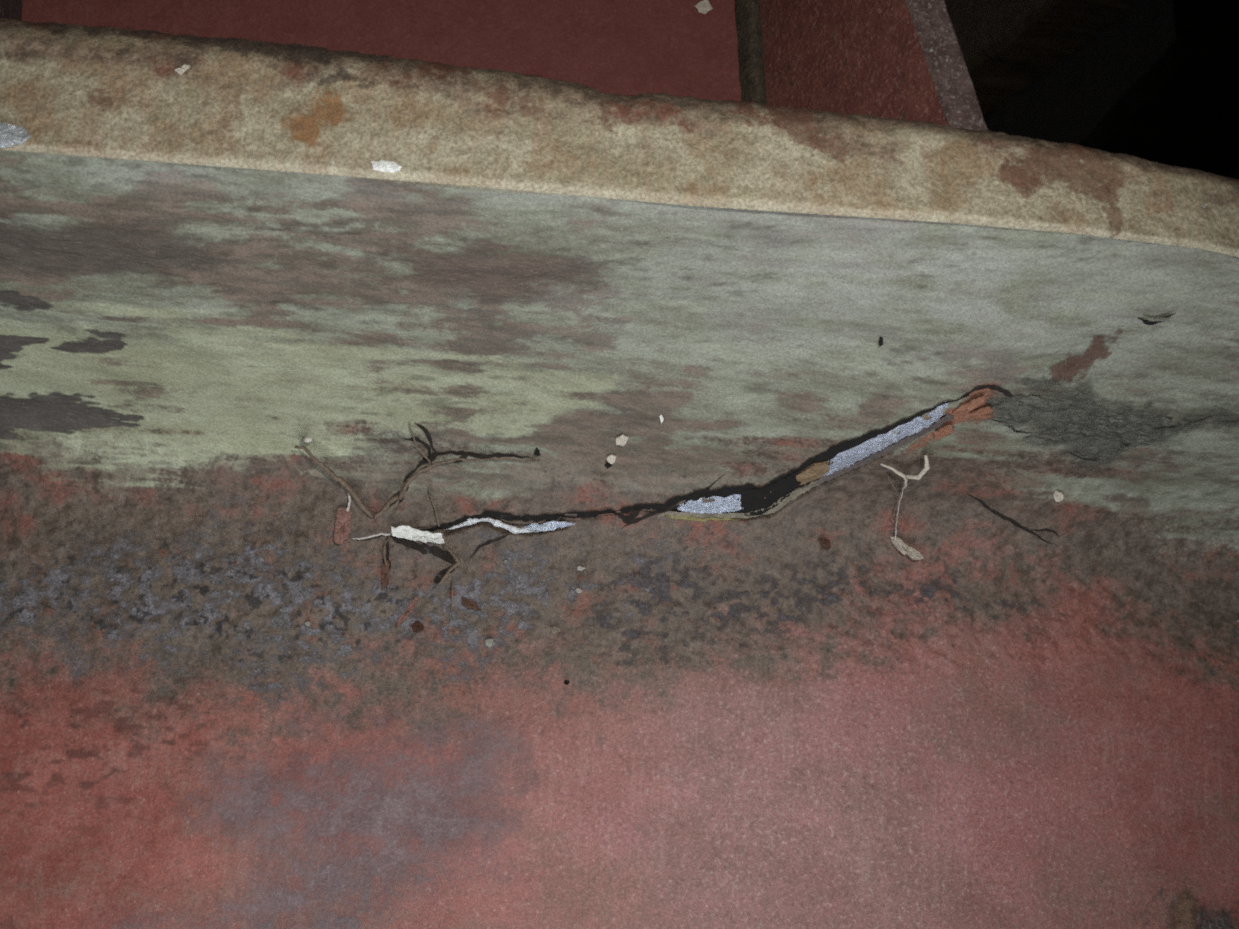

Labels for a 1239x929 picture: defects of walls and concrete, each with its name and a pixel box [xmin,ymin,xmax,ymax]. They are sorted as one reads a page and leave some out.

leakage [0,214,227,277]
leakage [381,238,607,304]
leakage [0,291,52,311]
leakage [0,330,126,369]
corrosion [1049,330,1121,383]
leakage [0,392,144,439]
crack [350,385,1013,590]